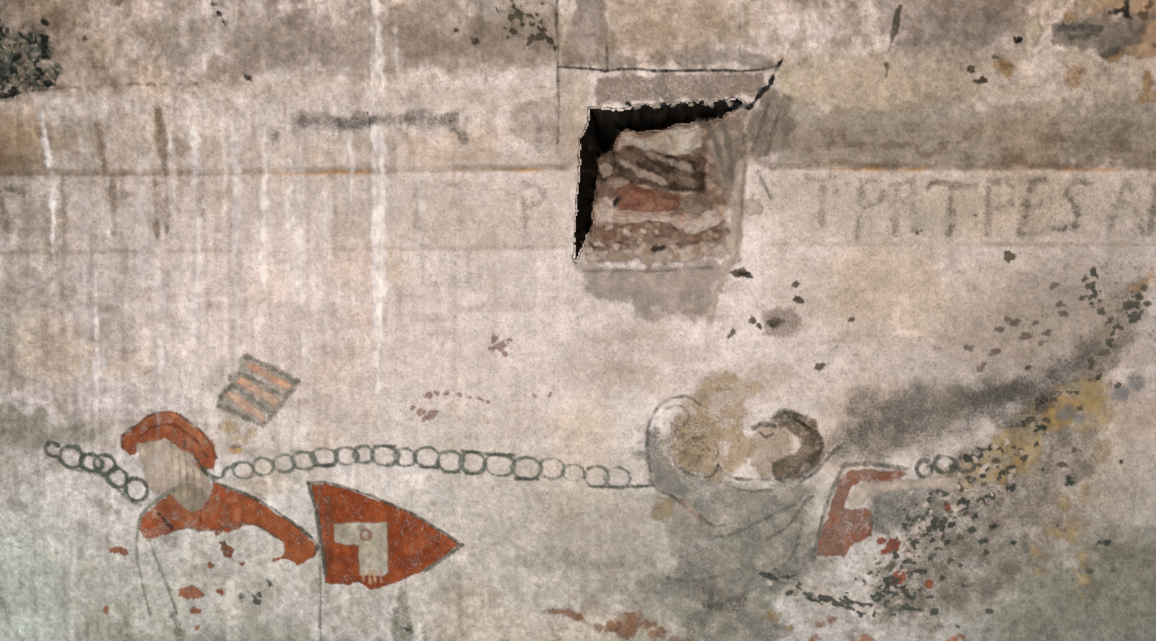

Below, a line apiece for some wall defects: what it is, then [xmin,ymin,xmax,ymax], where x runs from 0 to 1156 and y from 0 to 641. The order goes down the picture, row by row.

peeling [0,18,62,99]
damp [39,110,65,264]
damp [81,197,108,420]
damp [155,108,172,171]
damp [137,127,204,407]
damp [230,125,242,262]
damp [257,115,276,327]
damp [284,148,308,305]
damp [335,0,388,393]
spalling [572,59,791,278]
damp [823,345,1095,460]